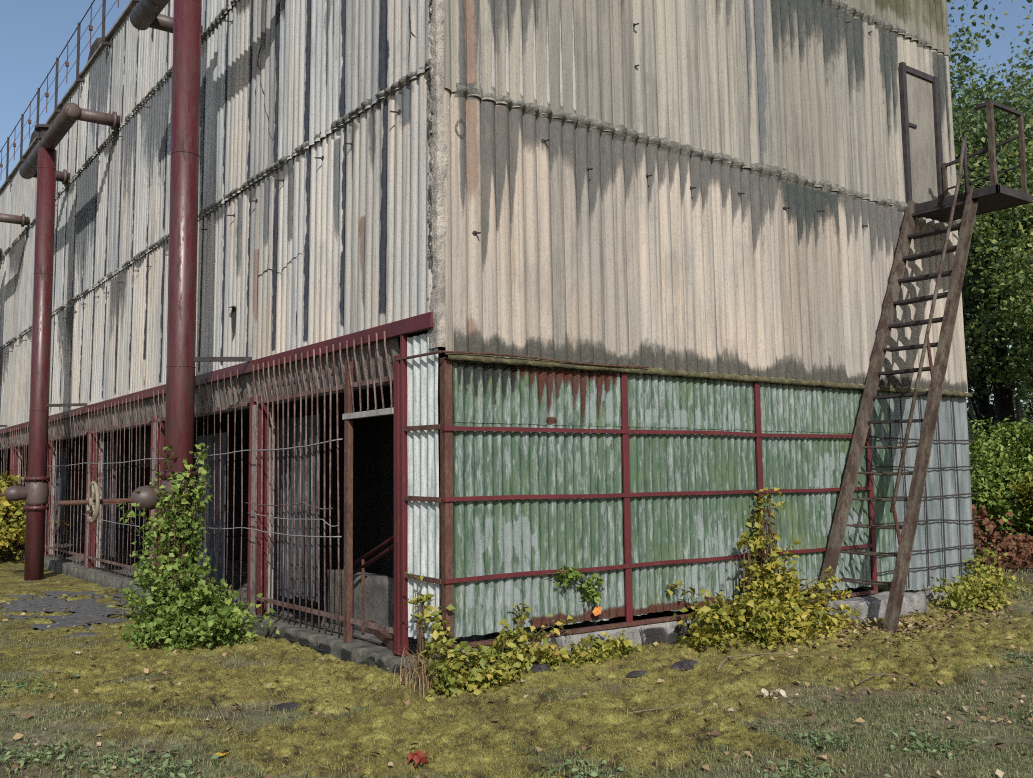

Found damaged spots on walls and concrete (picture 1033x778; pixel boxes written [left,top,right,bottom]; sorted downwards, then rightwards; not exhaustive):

water stain [57,304,74,366]
water stain [68,28,172,395]
water stain [199,44,207,211]
water stain [220,168,294,366]
water stain [261,0,280,163]
water stain [324,0,376,326]
water stain [379,187,387,314]
water stain [378,0,412,124]
rust [464,0,478,191]
water stain [457,362,517,403]
rust [508,365,617,424]
water stain [455,0,906,268]